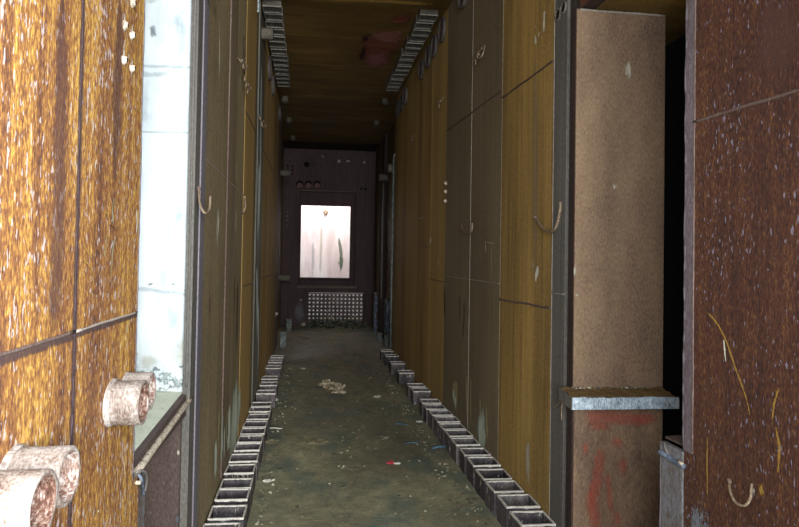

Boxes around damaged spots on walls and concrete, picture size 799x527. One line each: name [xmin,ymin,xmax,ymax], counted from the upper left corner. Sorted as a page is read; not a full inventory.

rust [50,0,67,328]
rust [113,8,123,164]
peeling [684,501,711,527]